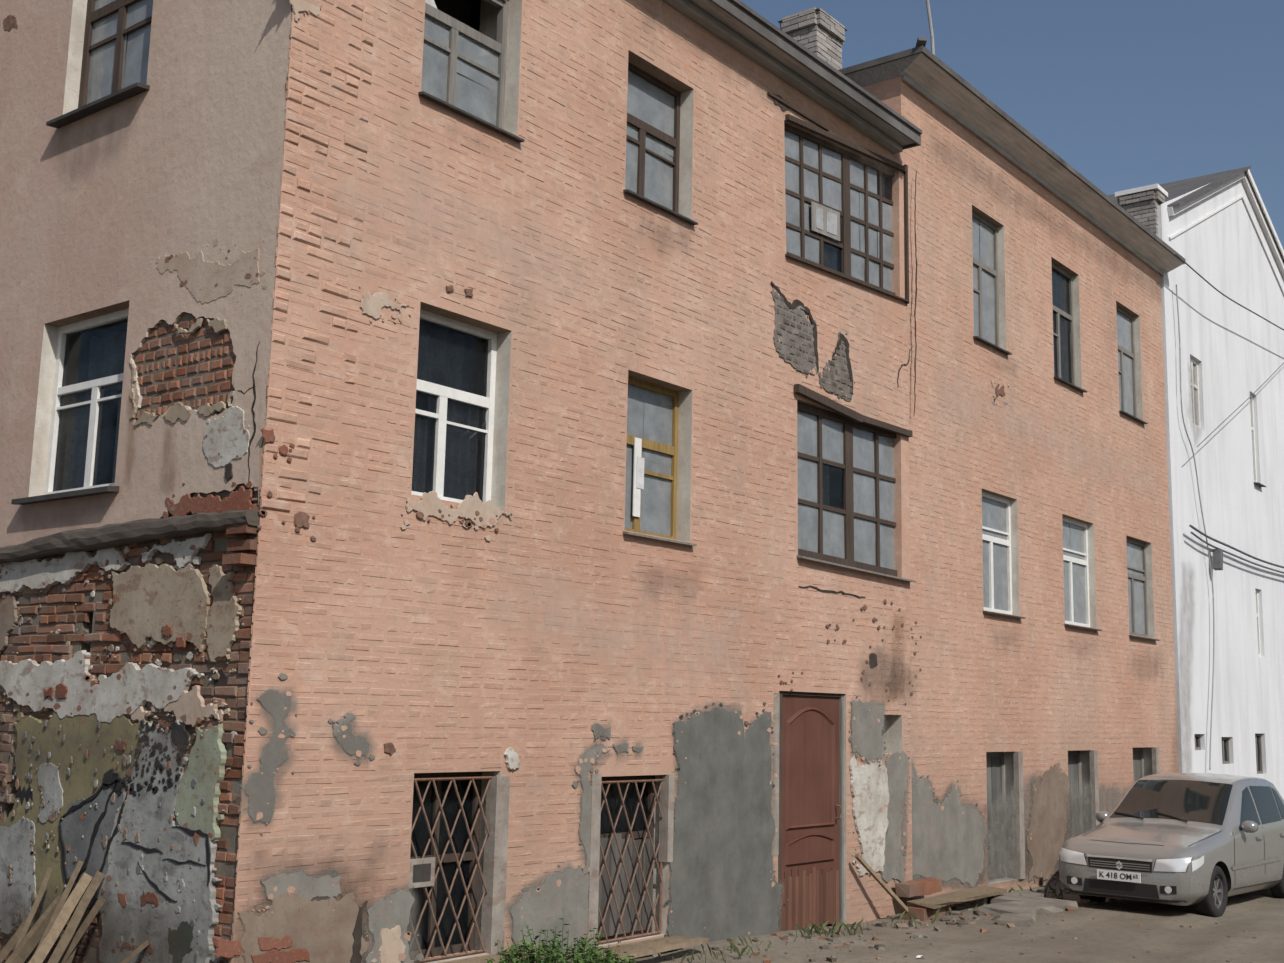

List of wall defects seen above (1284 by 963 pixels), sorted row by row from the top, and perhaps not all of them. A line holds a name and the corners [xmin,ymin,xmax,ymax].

flaking render [130,317,239,467]
crack [237,342,260,489]
spalling [243,425,295,463]
flaking render [771,281,856,402]
flaking render [0,481,377,963]
spalling [354,742,396,766]
peeling [672,702,774,783]
spalling [826,599,922,772]